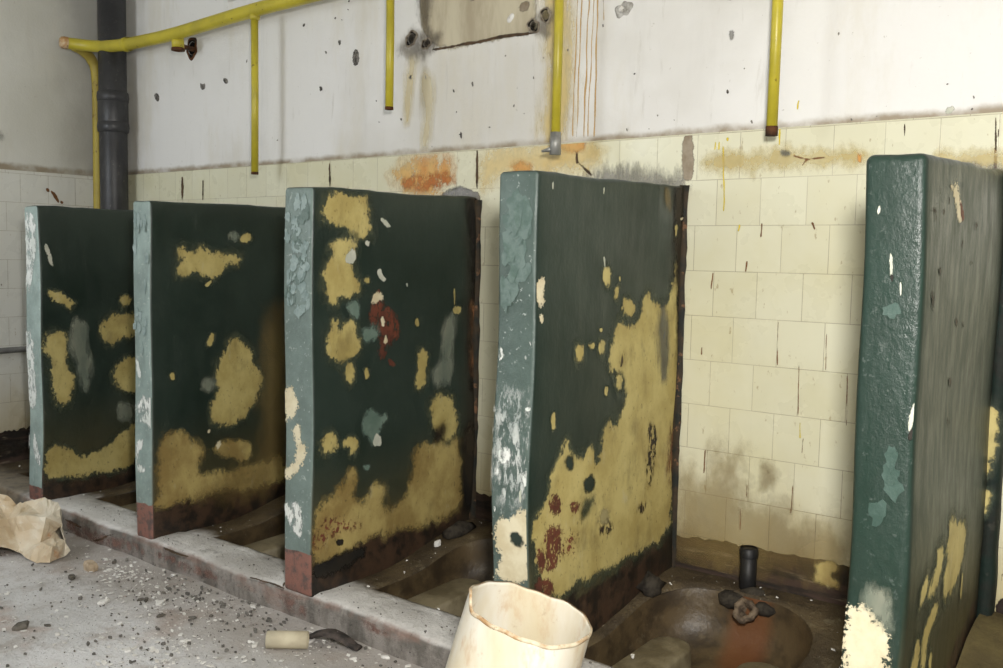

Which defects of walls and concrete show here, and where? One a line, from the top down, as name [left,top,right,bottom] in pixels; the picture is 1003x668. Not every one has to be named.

spalling [405,0,551,50]
corrosion [484,0,604,182]
corrosion [392,156,453,195]
damp [706,150,862,168]
damp [941,154,1003,169]
peeling [174,232,254,287]
peeling [284,190,391,389]
peeling [26,288,464,564]
peeling [493,257,678,599]
peeling [984,406,1001,516]
peeling [841,590,891,668]
peeling [910,512,968,668]